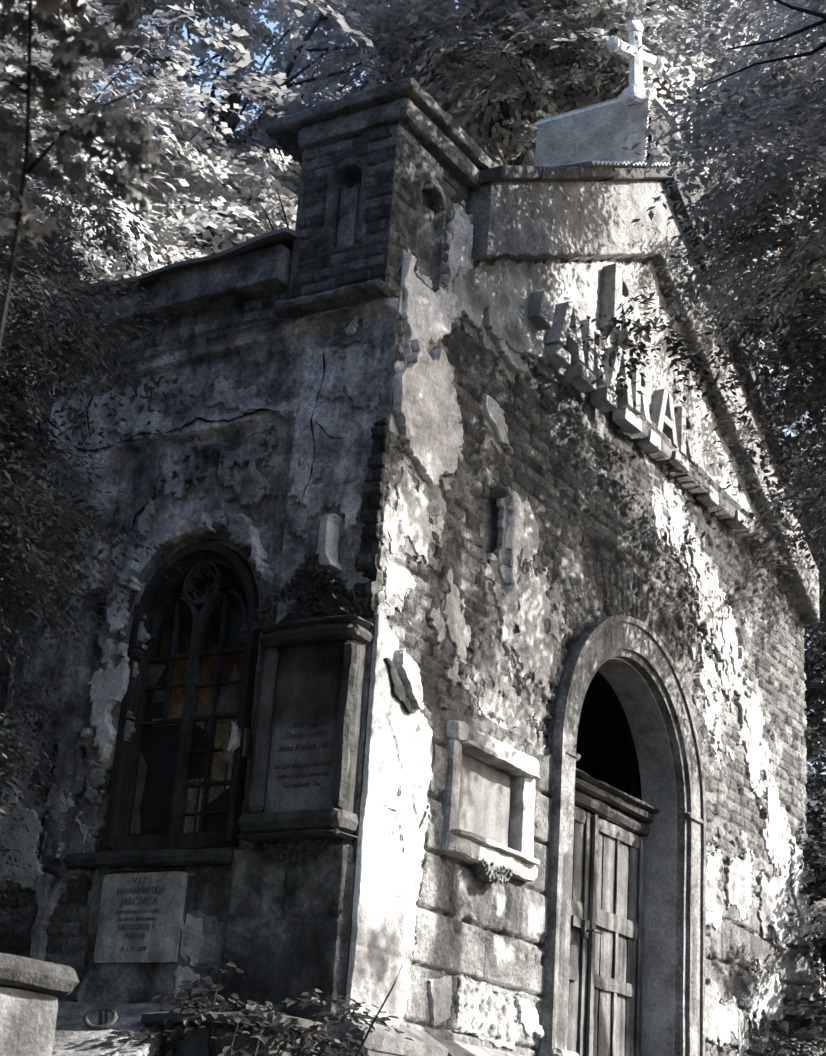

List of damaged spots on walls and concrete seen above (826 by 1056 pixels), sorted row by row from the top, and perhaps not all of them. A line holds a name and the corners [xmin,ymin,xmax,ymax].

crack [73,390,282,453]
crack [302,337,344,502]
peeling [0,568,151,1002]
crack [384,717,436,973]
flaking render [151,200,777,1027]
flaking render [639,449,826,1022]
flaking render [705,949,789,1056]